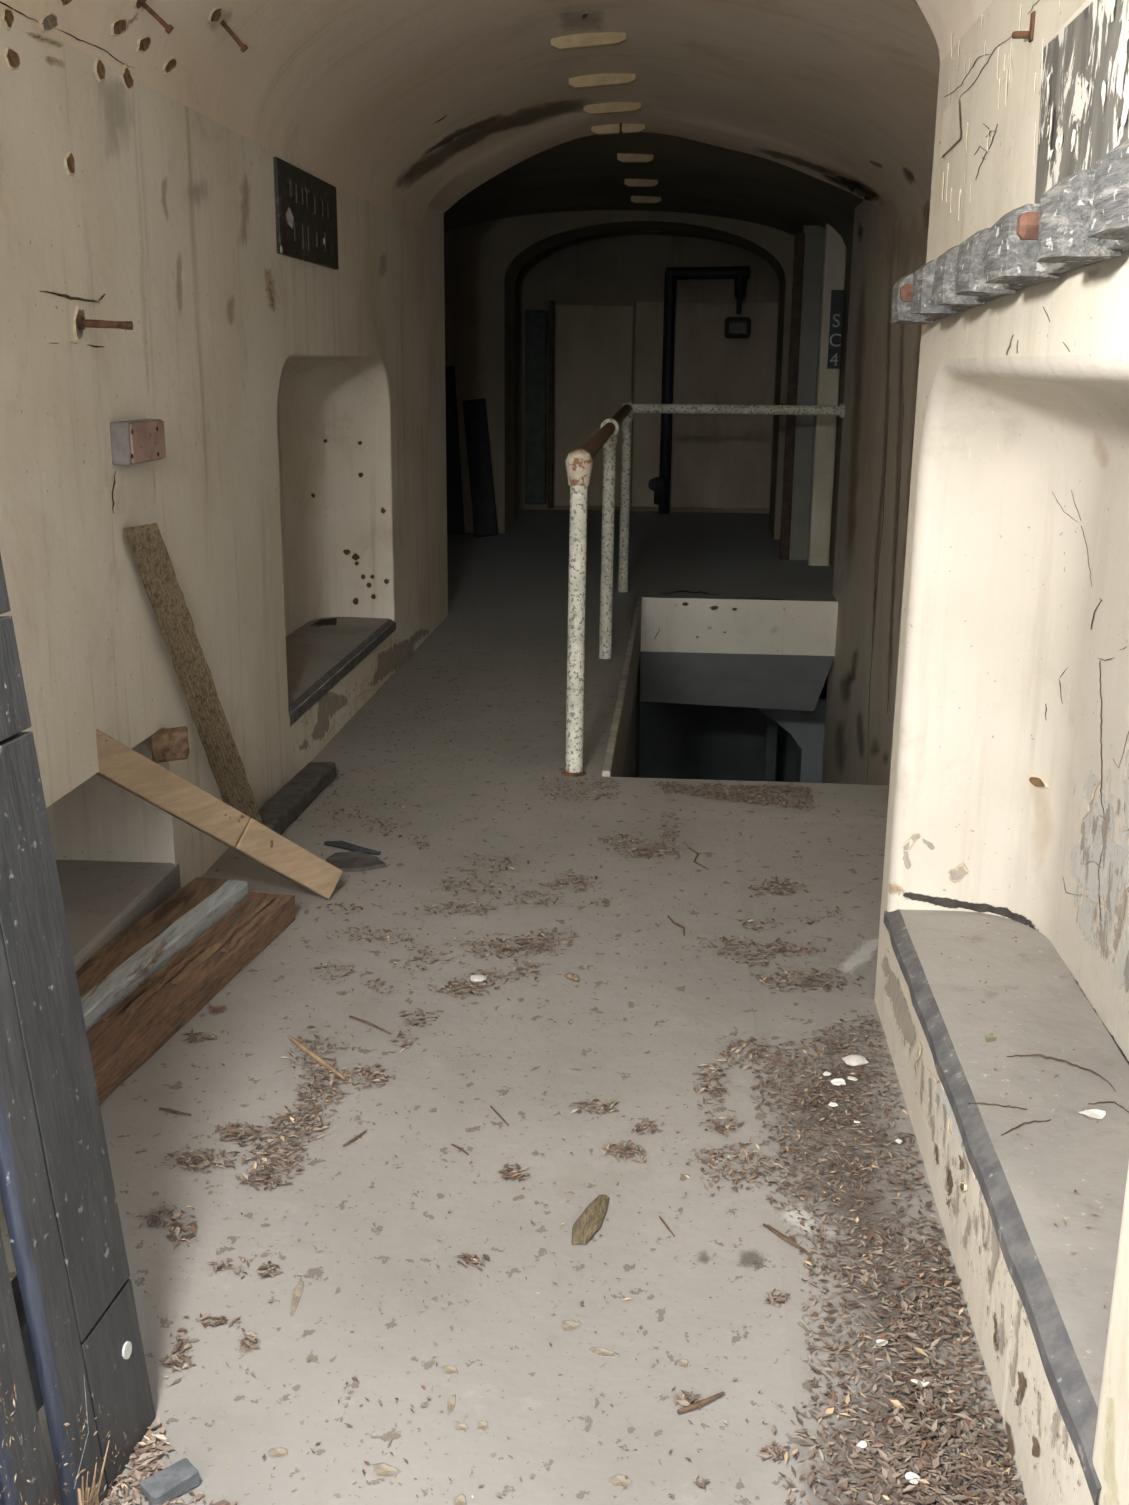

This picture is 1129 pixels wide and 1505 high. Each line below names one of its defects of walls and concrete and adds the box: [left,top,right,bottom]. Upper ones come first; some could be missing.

crack [974,124,998,180]
crack [946,0,1039,97]
crack [1045,490,1129,935]
peeling [1071,750,1129,993]